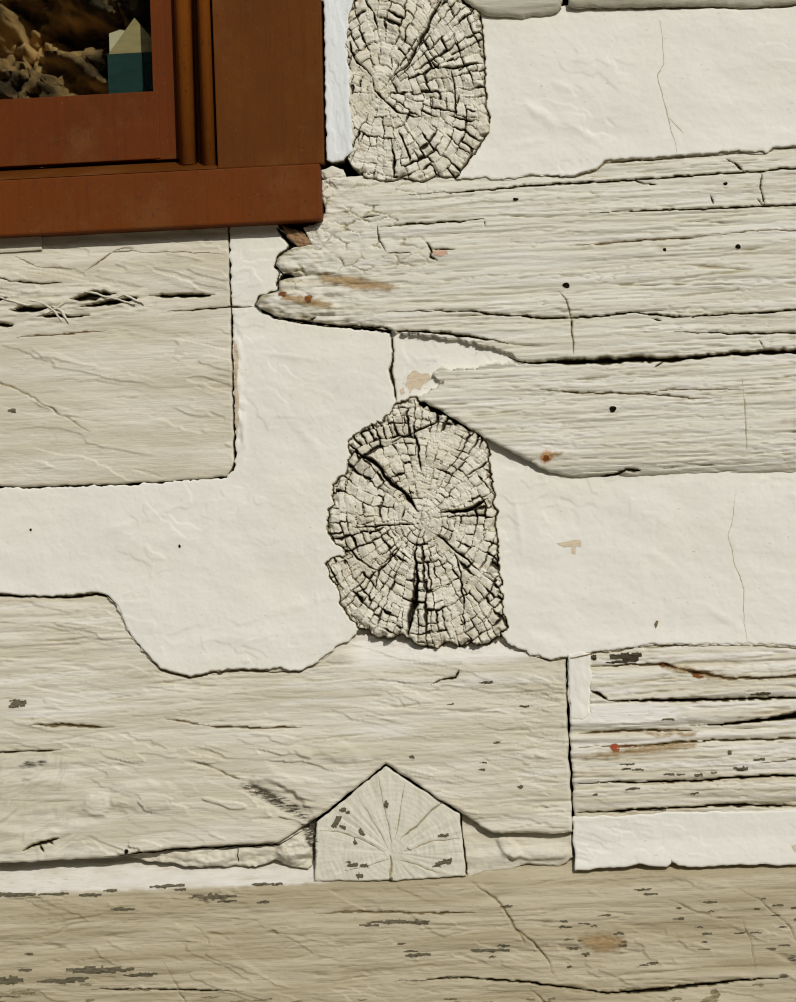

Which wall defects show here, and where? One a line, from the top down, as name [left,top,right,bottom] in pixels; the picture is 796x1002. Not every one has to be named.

crack [350,3,796,245]
crack [275,228,294,288]
crack [364,215,485,260]
crack [0,247,796,469]
crack [351,449,486,635]
crack [601,469,641,477]
crack [511,502,796,813]
crack [332,880,778,1001]